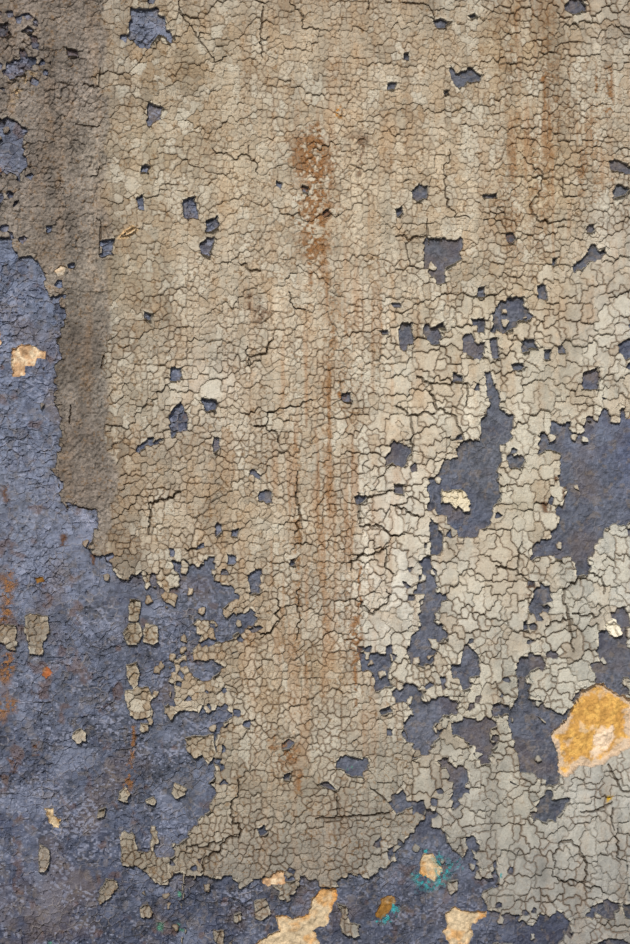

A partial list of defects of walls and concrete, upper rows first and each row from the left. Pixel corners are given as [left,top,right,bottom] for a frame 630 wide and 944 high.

peeling [120,0,181,51]
peeling [0,114,33,182]
peeling [181,193,221,259]
rust [293,123,333,284]
peeling [393,182,430,218]
crack [254,399,313,443]
crack [395,375,469,452]
peeling [0,222,630,944]
crack [349,490,419,616]
crack [545,572,606,653]
crack [186,776,243,874]
crack [551,839,603,893]